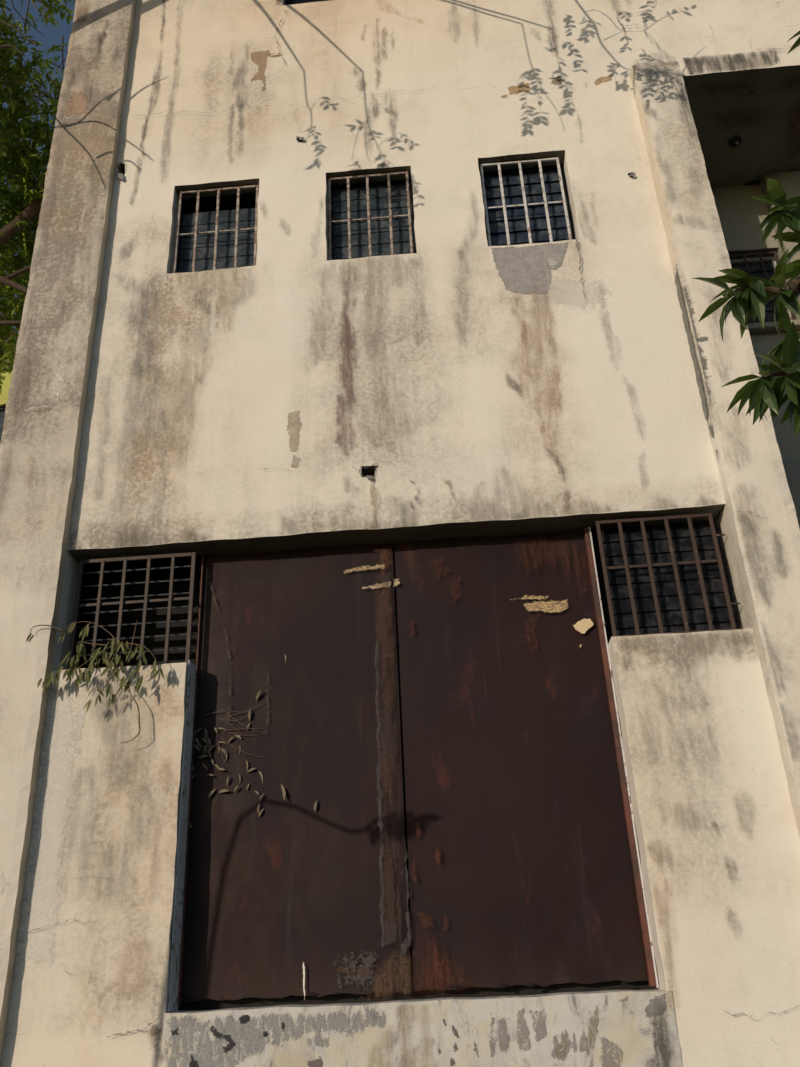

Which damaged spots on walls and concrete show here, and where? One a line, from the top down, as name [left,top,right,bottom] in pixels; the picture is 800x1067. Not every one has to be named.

crack [617,0,659,57]
peeling [251,50,281,91]
peeling [501,83,530,98]
flaking render [491,243,568,294]
leakage [336,269,354,455]
peeling [287,410,302,468]
rust [338,944,462,997]
leakage [654,1013,671,1067]